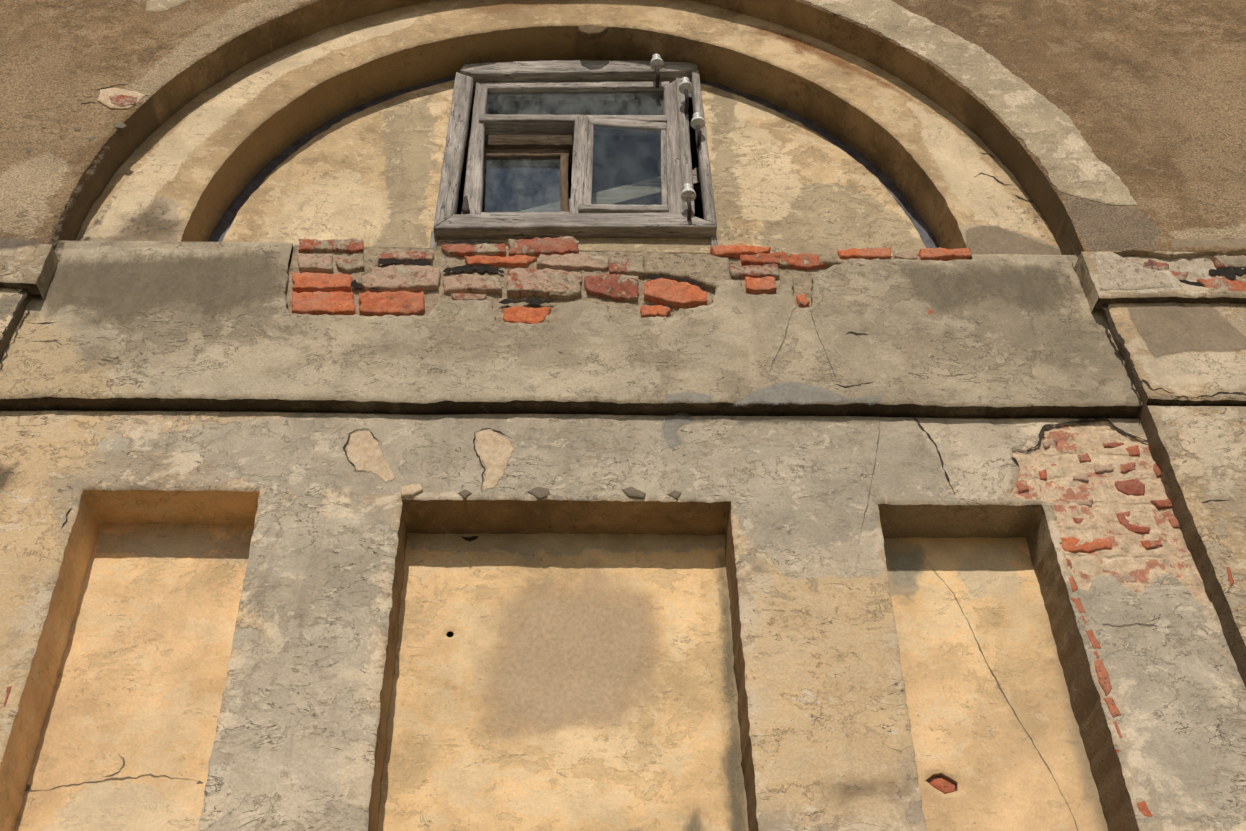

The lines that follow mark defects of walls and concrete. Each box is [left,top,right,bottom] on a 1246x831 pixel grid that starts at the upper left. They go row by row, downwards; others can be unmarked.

spalling [97,88,145,130]
spalling [284,236,971,324]
spalling [1113,250,1246,292]
peeling [343,428,423,497]
peeling [457,428,514,514]
crack [858,421,880,542]
crack [909,413,955,494]
peeling [1011,417,1210,754]
crack [917,547,1078,830]
crack [25,755,203,791]
spalling [1136,801,1153,817]